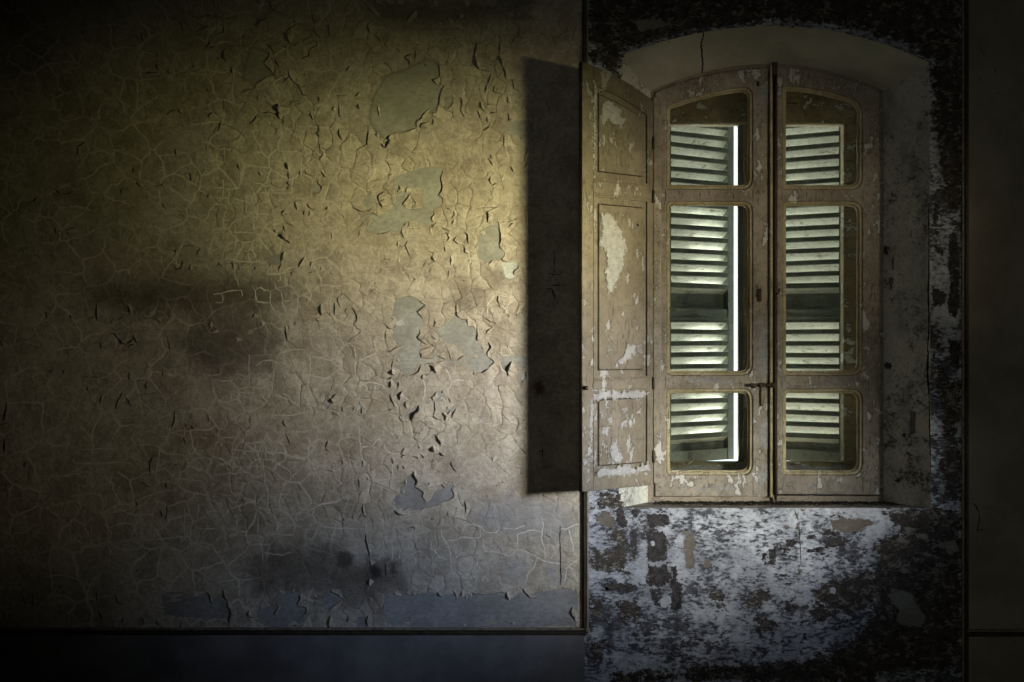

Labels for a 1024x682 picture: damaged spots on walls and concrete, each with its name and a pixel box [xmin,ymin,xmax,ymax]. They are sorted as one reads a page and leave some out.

crack [698,31,706,73]
peeling [359,60,468,152]
peeling [352,167,448,239]
peeling [474,219,523,282]
crack [167,66,580,602]
peeling [384,292,534,427]
peeling [347,380,711,628]